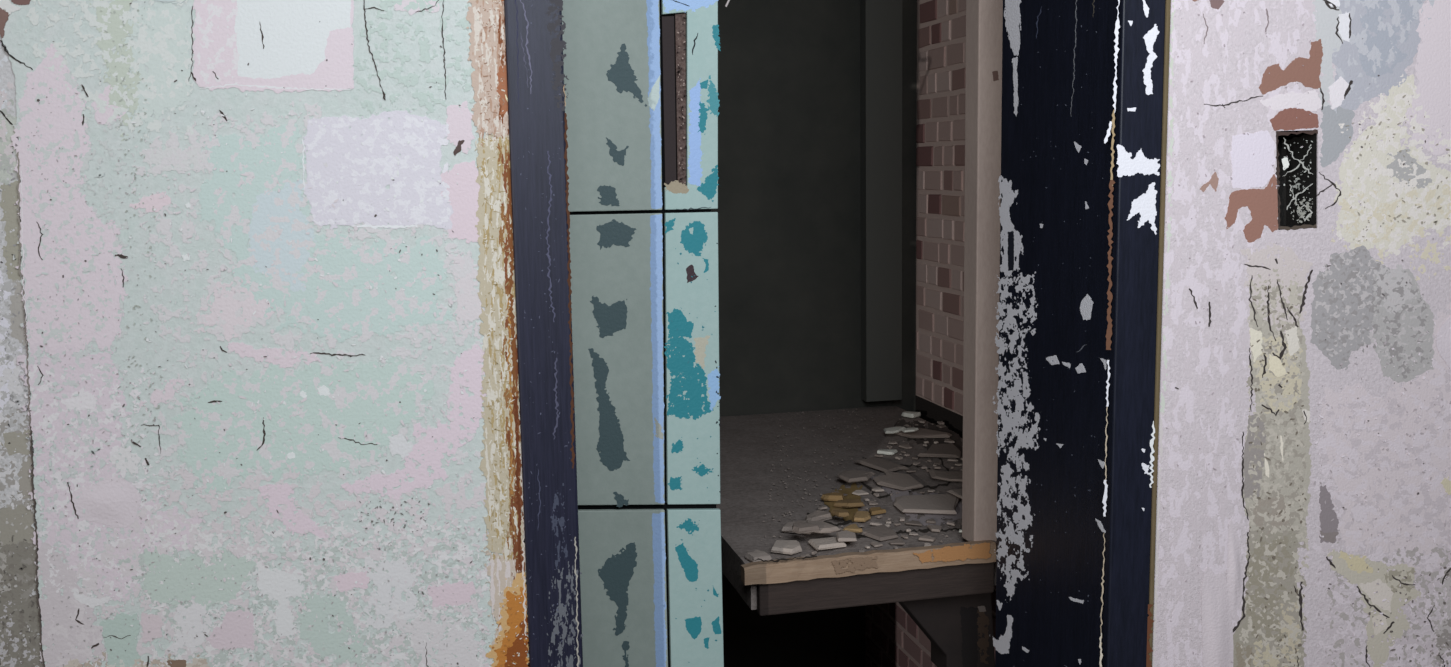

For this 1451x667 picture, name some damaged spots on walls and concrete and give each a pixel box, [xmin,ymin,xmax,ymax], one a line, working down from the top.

peeling [1004,0,1021,115]
crack [1204,96,1260,108]
peeling [0,0,522,667]
rust [466,0,529,667]
peeling [978,176,1063,654]
spalling [1046,355,1110,667]
peeling [1080,294,1093,320]
spalling [1104,0,1451,667]
crack [1294,557,1451,667]